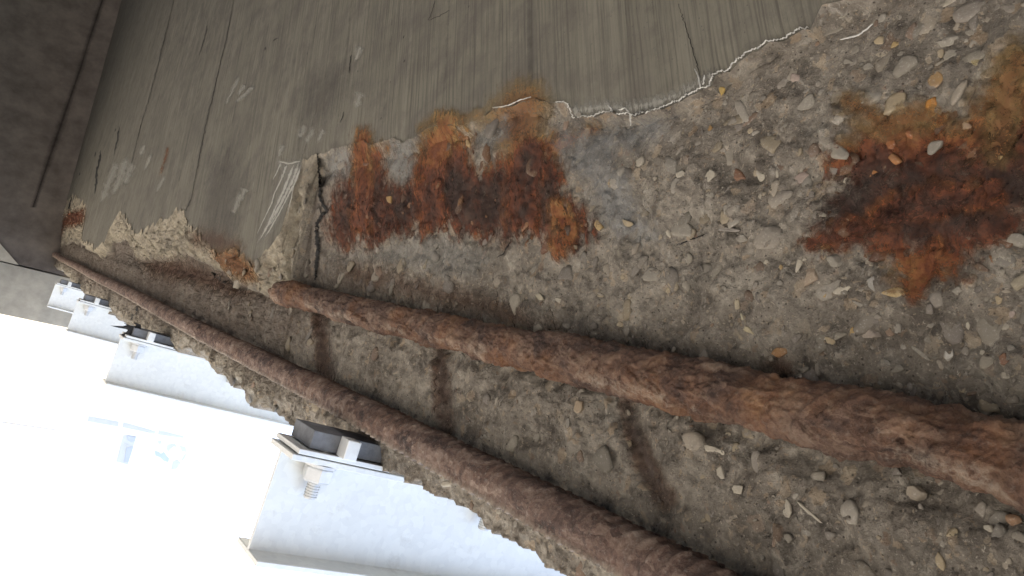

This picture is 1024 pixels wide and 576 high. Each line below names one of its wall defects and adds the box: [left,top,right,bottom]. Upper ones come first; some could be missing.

crack [679,8,700,75]
spalling [363,125,438,214]
rust [321,79,597,262]
spalling [444,107,514,184]
spalling [870,140,904,187]
rust [797,36,1024,305]
spalling [927,140,943,155]
crack [314,154,331,280]
rust [313,313,332,378]
spalling [54,260,617,576]
rust [433,349,452,435]
rust [621,399,674,509]